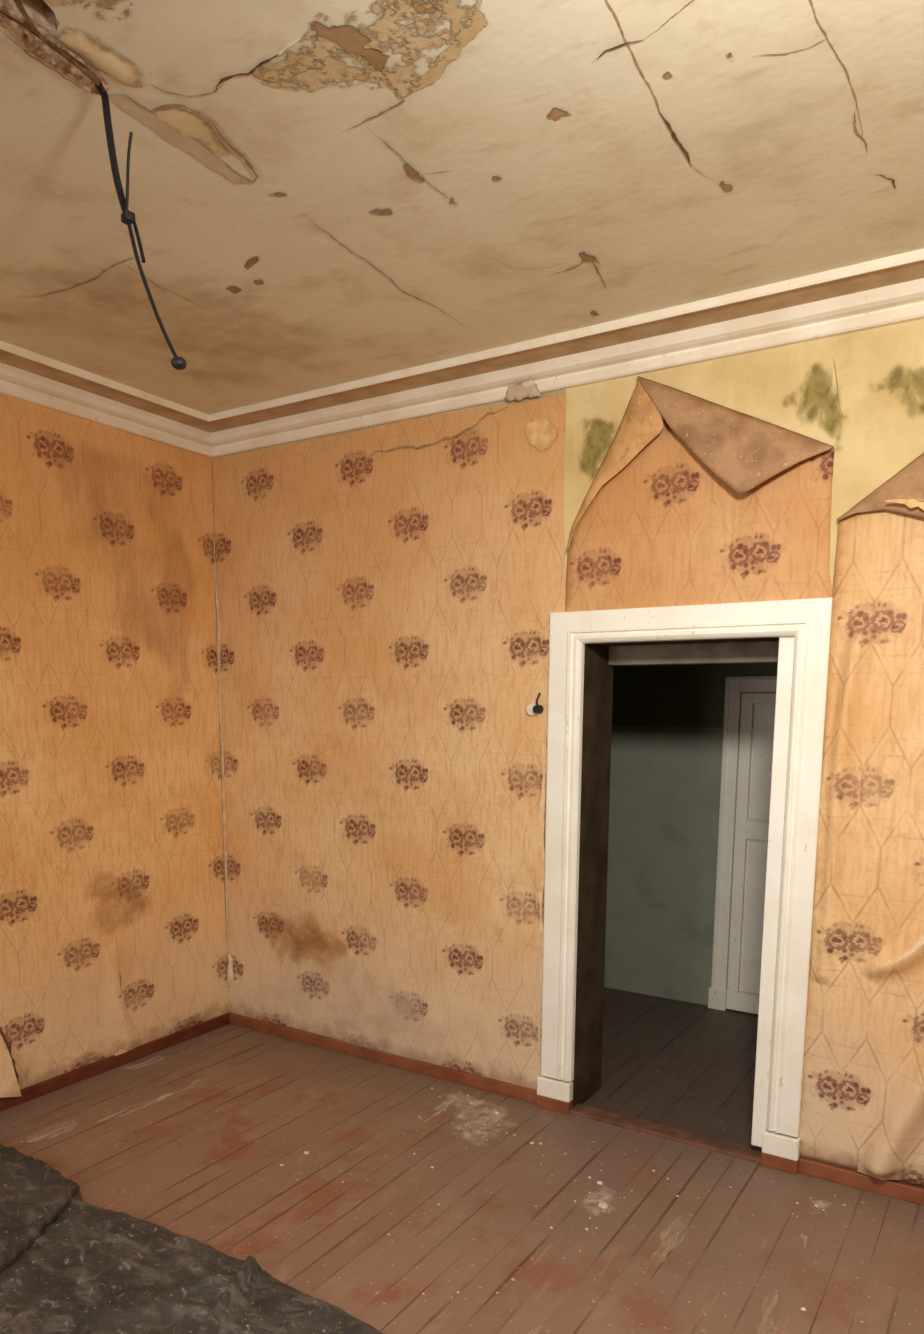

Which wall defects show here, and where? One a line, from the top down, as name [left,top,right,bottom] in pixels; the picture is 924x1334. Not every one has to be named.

peeling [0,0,488,183]
peeling [547,108,570,120]
crack [598,0,732,191]
crack [753,0,896,189]
water stain [581,420,613,478]
peeling [564,319,924,588]
water stain [791,366,842,433]
water stain [888,368,924,411]